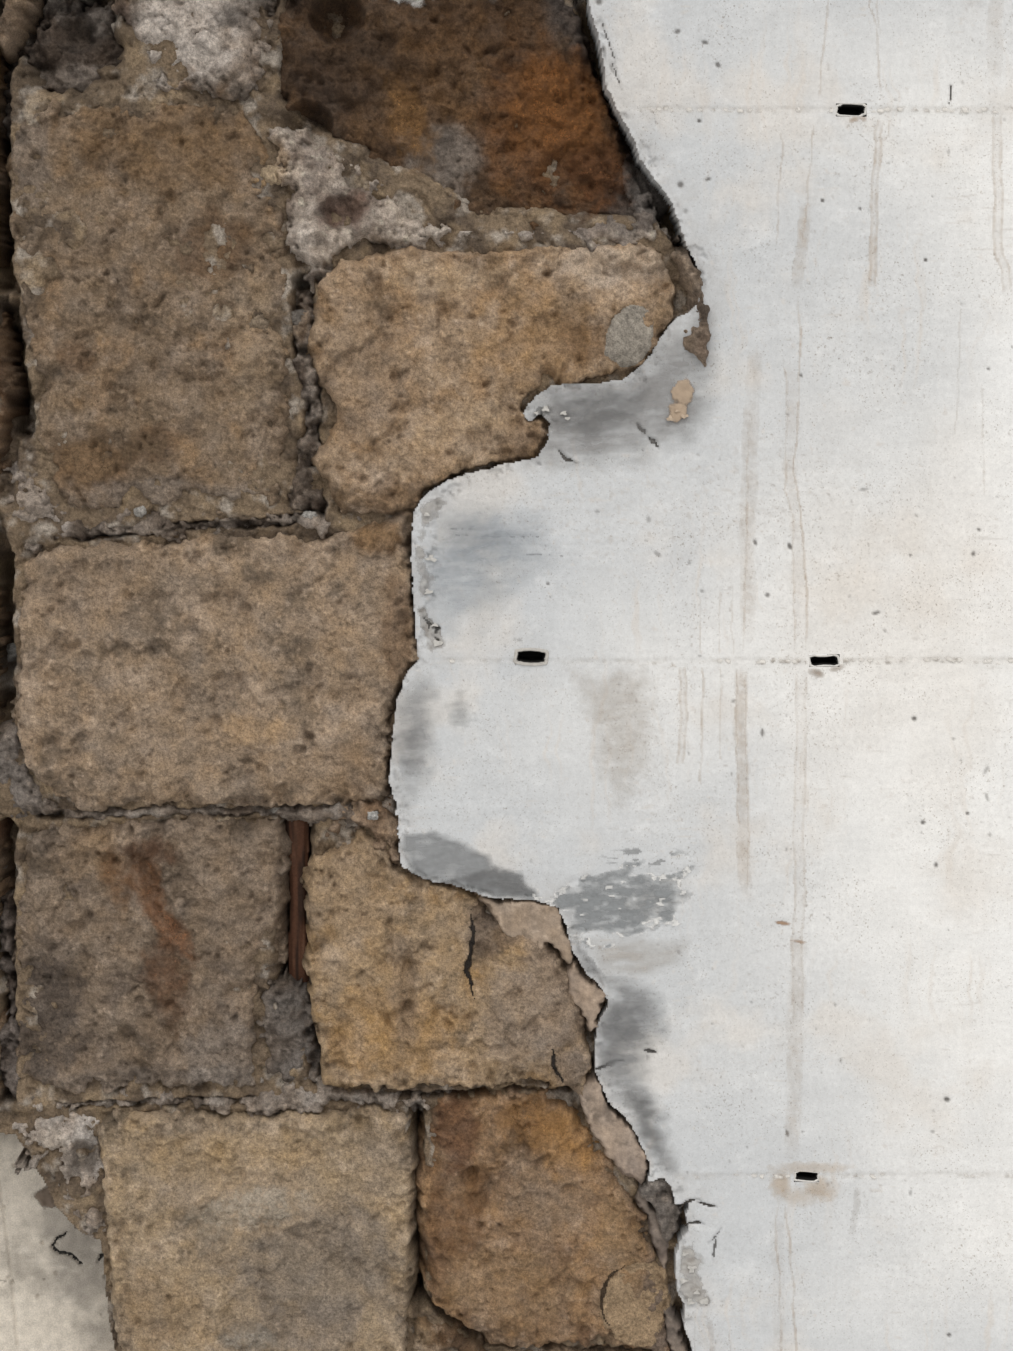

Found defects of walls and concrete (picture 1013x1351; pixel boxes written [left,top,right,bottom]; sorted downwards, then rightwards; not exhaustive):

spalling [534,406,570,420]
peeling [666,379,694,422]
spalling [420,498,446,524]
spalling [416,547,443,649]
water stain [405,834,535,900]
peeling [474,849,691,1032]
water stain [606,988,653,1136]
peeling [34,1186,55,1209]
peeling [578,1064,709,1351]